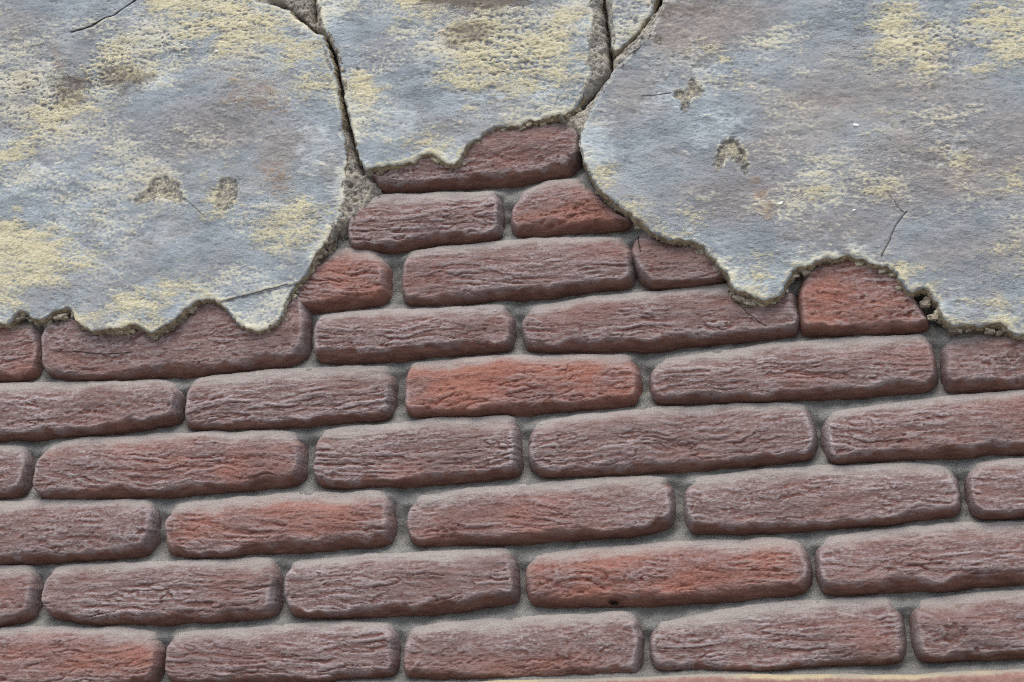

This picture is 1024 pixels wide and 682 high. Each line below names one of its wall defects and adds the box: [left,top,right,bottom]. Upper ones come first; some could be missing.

crack [72,0,136,32]
crack [257,0,383,242]
spalling [475,106,583,144]
crack [559,0,663,172]
spalling [135,179,183,203]
spalling [585,168,704,254]
crack [881,197,907,257]
spalling [0,309,85,330]
spalling [110,228,342,341]
spalling [712,257,1024,341]